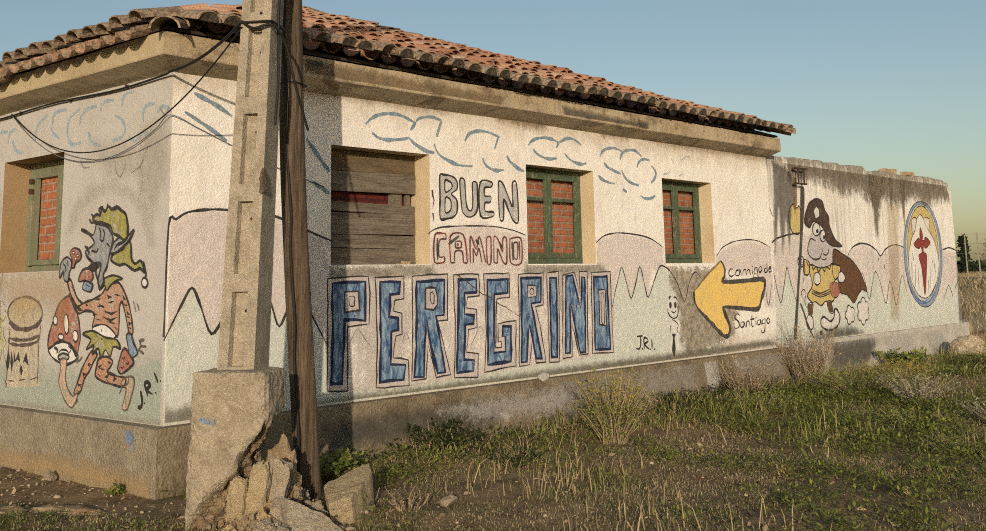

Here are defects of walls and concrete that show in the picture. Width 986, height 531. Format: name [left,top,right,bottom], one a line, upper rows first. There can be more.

damp [766,159,950,245]
spalling [188,421,273,531]